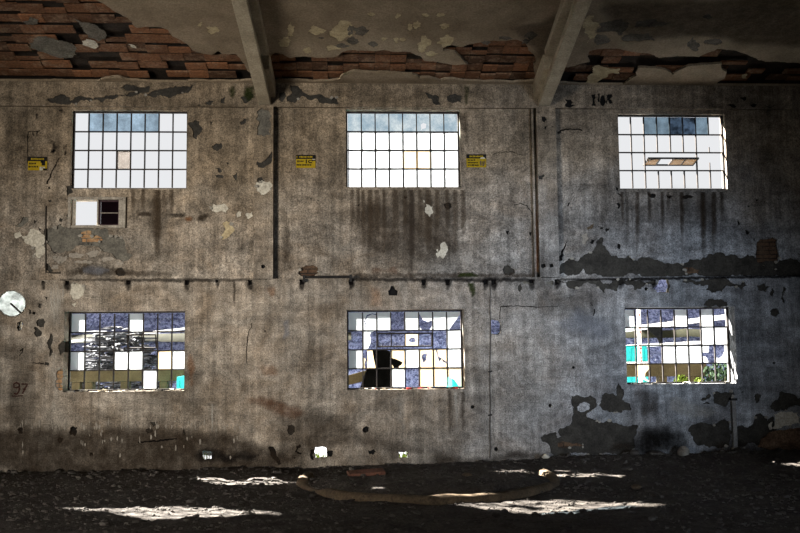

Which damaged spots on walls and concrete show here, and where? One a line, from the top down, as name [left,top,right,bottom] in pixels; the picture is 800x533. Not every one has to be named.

peeling [308,12,454,56]
spalling [48,84,193,105]
flaking render [586,65,620,83]
peeling [255,152,272,195]
spalling [14,214,132,276]
leakage [352,190,445,255]
spalling [541,220,800,317]
leakage [701,192,723,237]
spalling [541,384,638,456]
spalling [688,389,800,448]